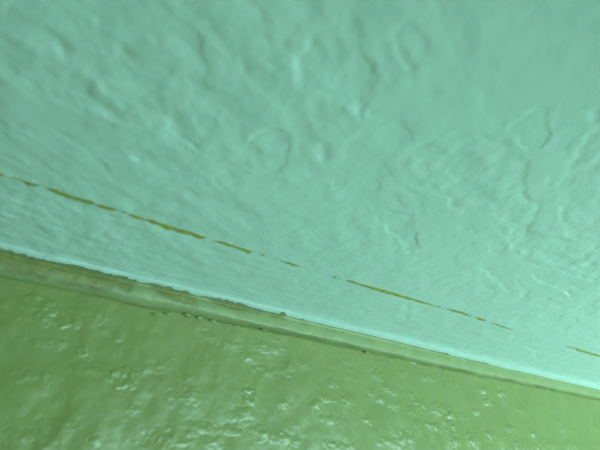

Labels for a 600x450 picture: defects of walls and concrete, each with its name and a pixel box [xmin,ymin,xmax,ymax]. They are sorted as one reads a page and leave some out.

crack [0,173,600,357]